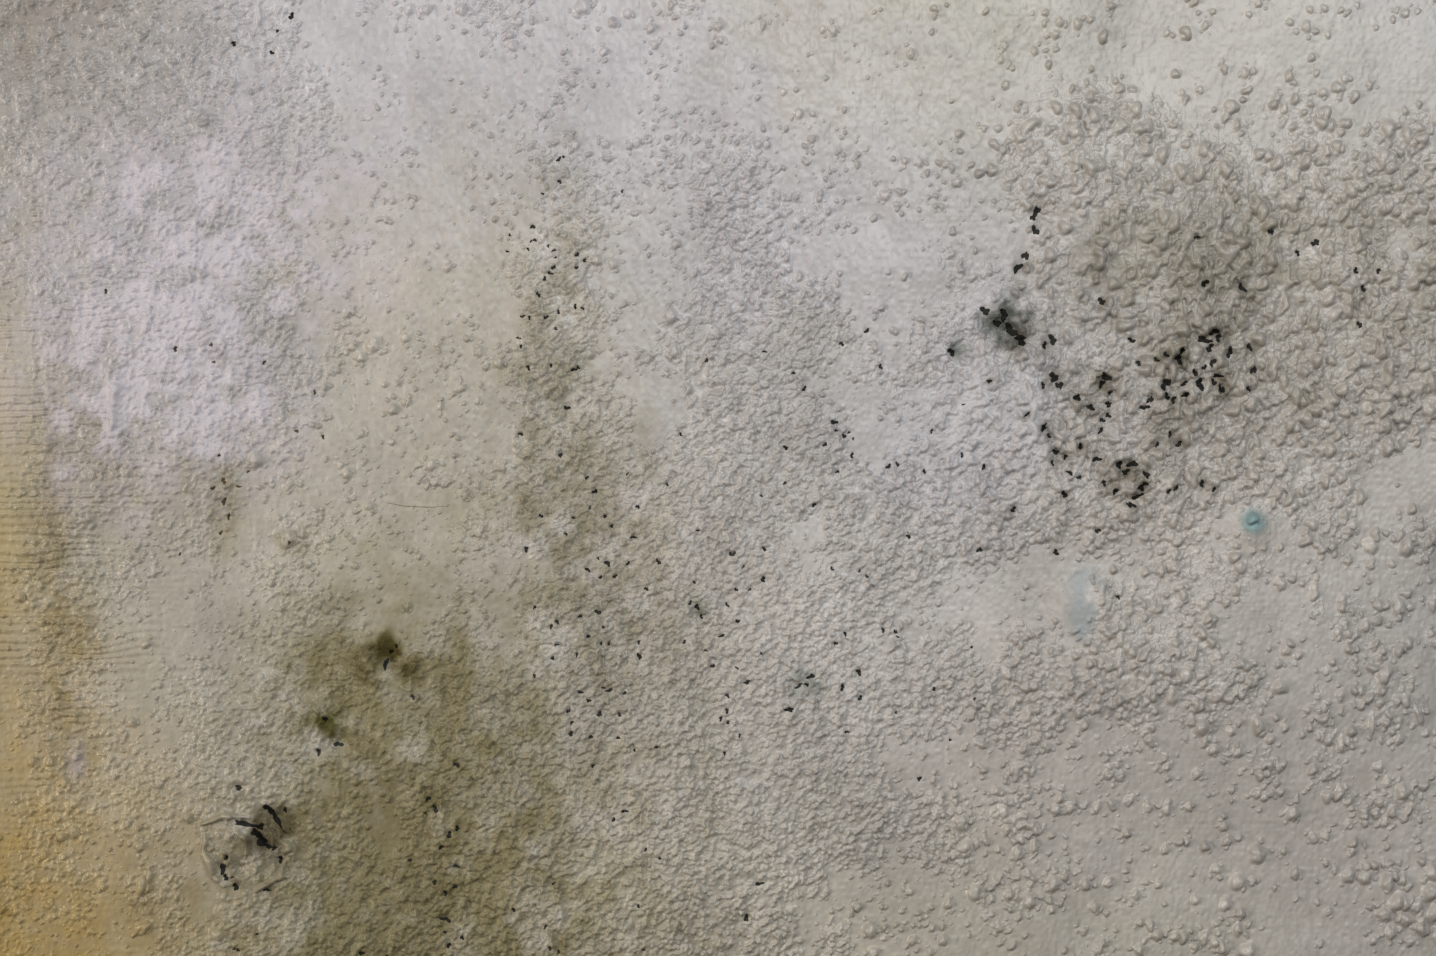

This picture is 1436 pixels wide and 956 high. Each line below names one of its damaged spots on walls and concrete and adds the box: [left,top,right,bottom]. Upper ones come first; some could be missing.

leakage [1030,206,1041,235]
leakage [1013,251,1029,274]
leakage [979,306,1057,349]
leakage [1135,329,1257,410]
leakage [1041,372,1113,434]
leakage [0,142,291,826]
spalling [108,63,995,956]
leakage [1039,422,1150,508]
leakage [235,804,287,864]
leakage [220,855,239,891]